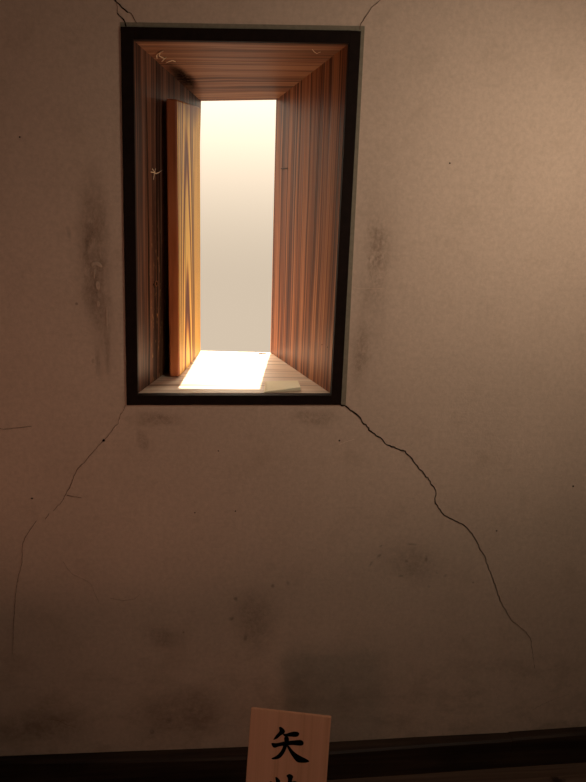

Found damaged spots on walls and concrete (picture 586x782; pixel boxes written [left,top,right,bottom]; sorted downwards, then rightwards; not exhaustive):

crack [114,0,136,27]
crack [341,405,535,668]